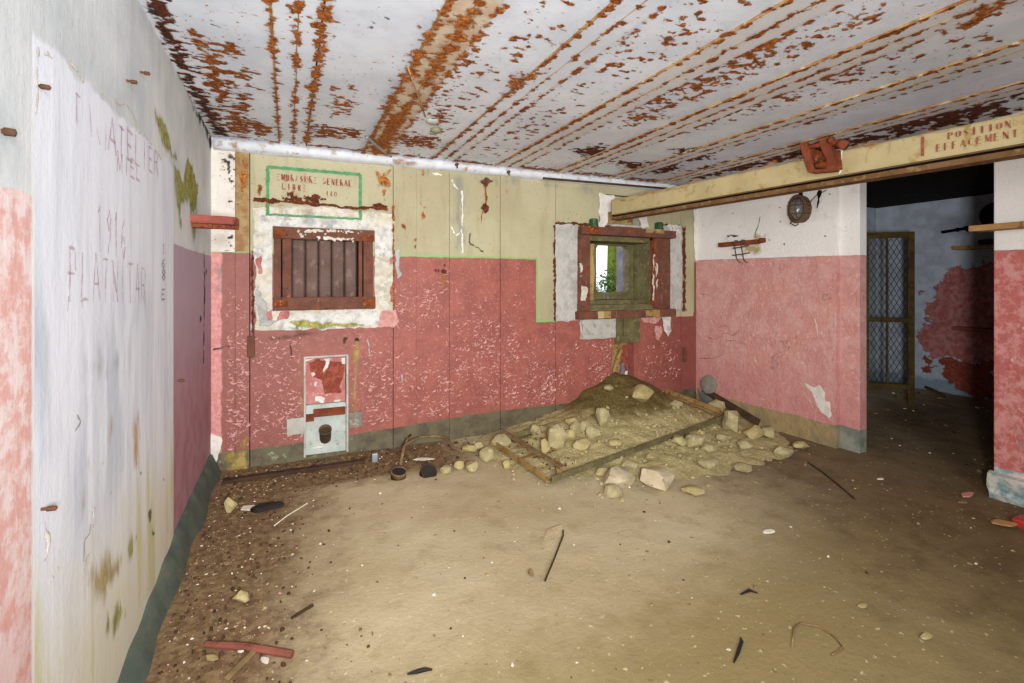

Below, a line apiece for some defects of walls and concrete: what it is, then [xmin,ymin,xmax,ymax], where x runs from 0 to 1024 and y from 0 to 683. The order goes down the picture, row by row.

damp [155,112,198,239]
corrosion [147,0,1024,321]
flaking render [211,206,612,461]
peeling [804,383,831,418]
peeling [915,261,1023,400]